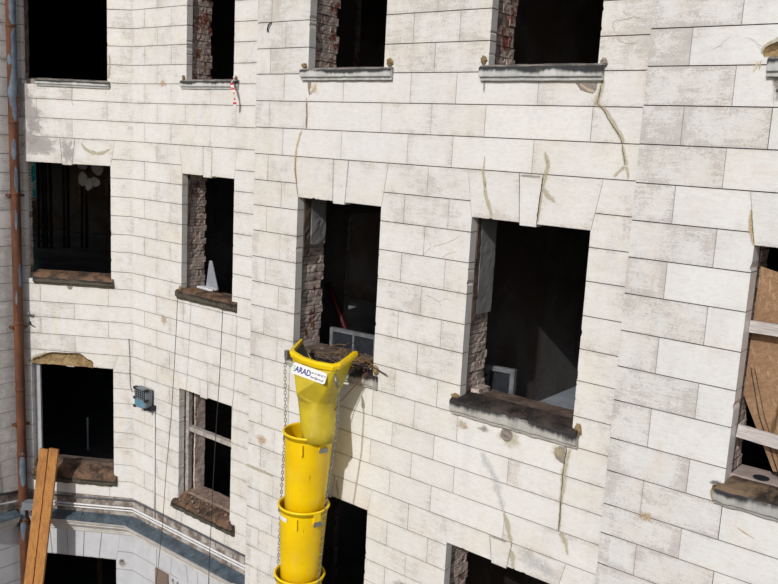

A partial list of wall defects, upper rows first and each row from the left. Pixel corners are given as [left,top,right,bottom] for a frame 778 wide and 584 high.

spalling [743,37,778,70]
crack [294,98,307,193]
crack [595,81,629,177]
spalling [29,352,93,368]
crack [558,447,571,529]